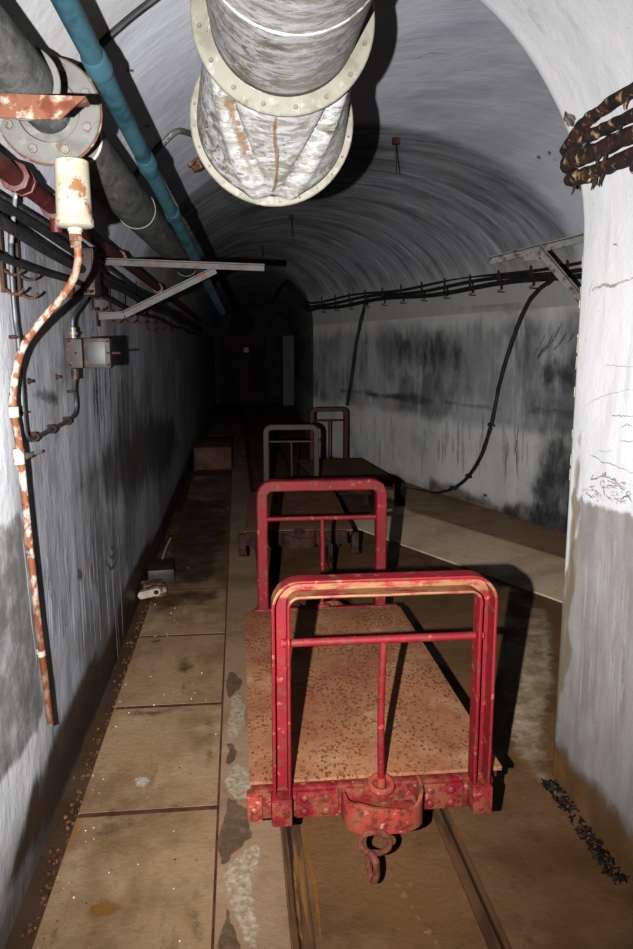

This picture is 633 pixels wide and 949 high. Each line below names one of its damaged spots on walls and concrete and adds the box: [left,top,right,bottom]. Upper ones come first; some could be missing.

water stain [545,361,575,382]
water stain [90,368,178,500]
water stain [11,454,226,880]
spalling [226,694,246,739]
spalling [225,764,251,799]
spalling [225,845,260,948]